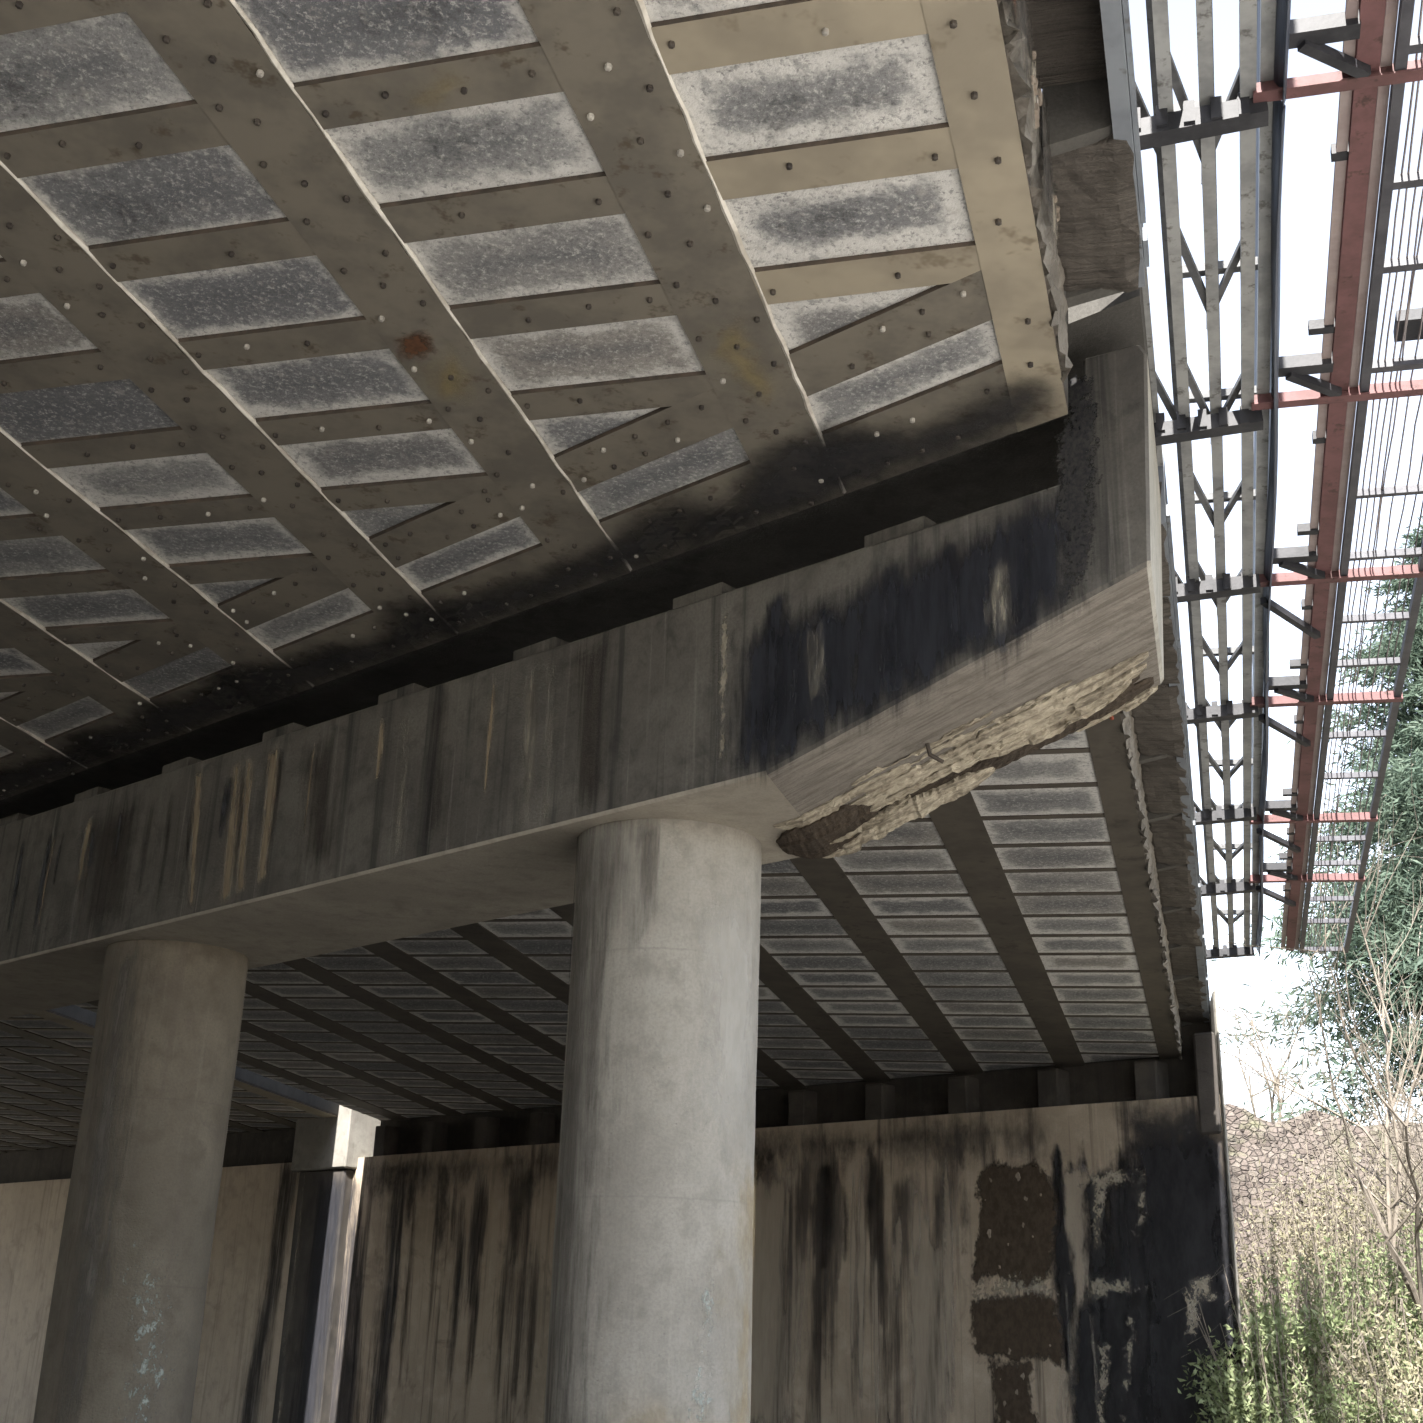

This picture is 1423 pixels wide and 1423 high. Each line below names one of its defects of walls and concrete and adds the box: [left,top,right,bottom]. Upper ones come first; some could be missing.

corrosion [397,333,434,359]
leakage [0,384,1046,802]
leakage [718,375,1102,773]
leakage [219,774,252,877]
spalling [773,651,1158,859]
leakage [498,1158,536,1392]
leakage [544,836,620,1423]
leakage [750,1121,1033,1423]
leakage [972,1108,1241,1423]